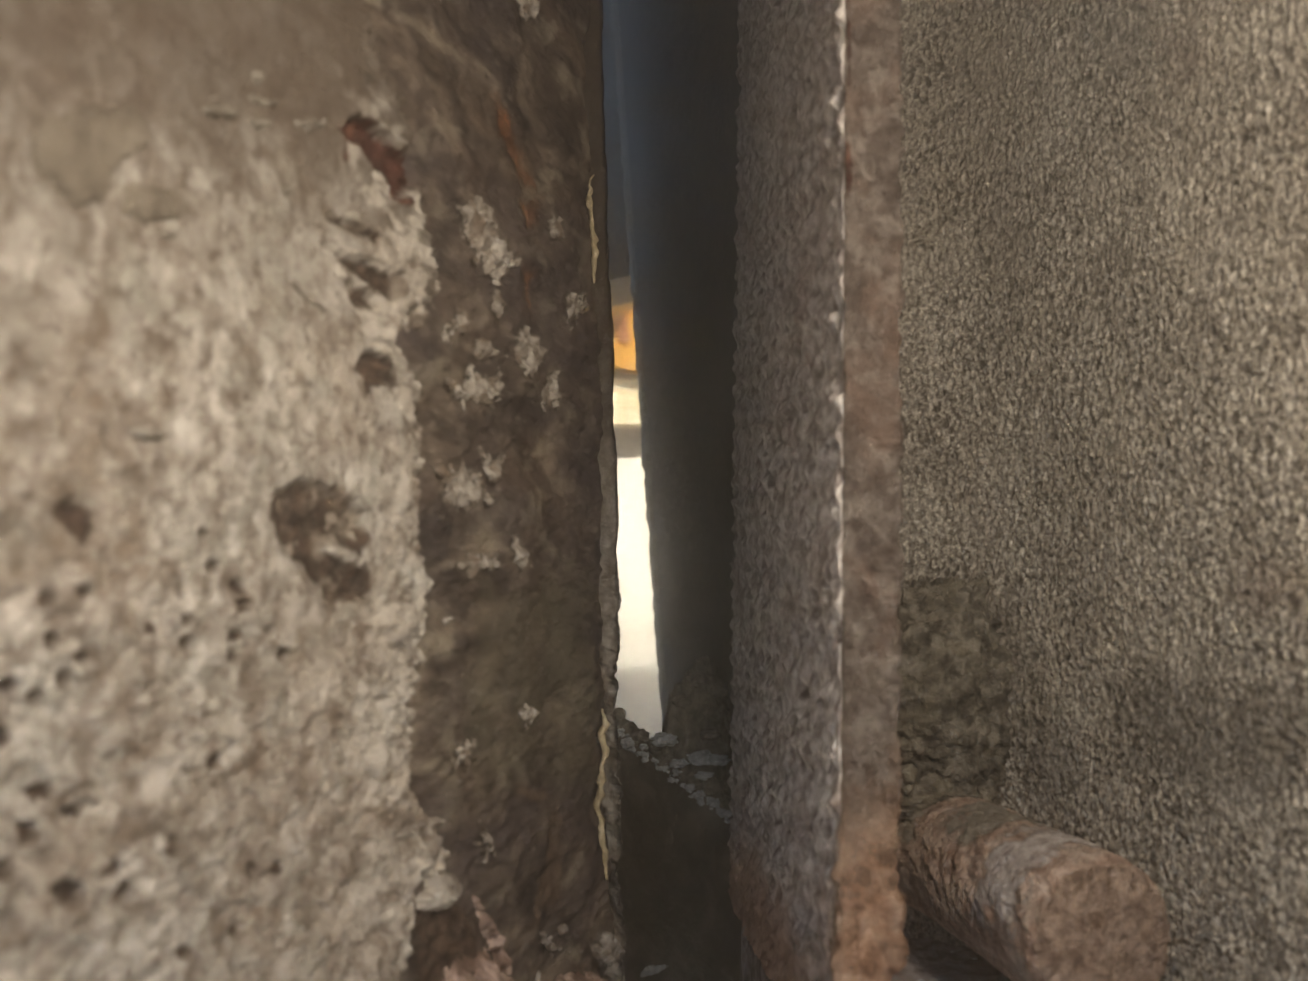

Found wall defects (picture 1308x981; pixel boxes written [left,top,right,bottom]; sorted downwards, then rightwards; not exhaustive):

rust [339,118,415,206]
peeling [326,217,379,243]
peeling [342,259,390,309]
spalling [269,481,370,611]
spalling [363,0,615,981]
crack [593,709,611,880]